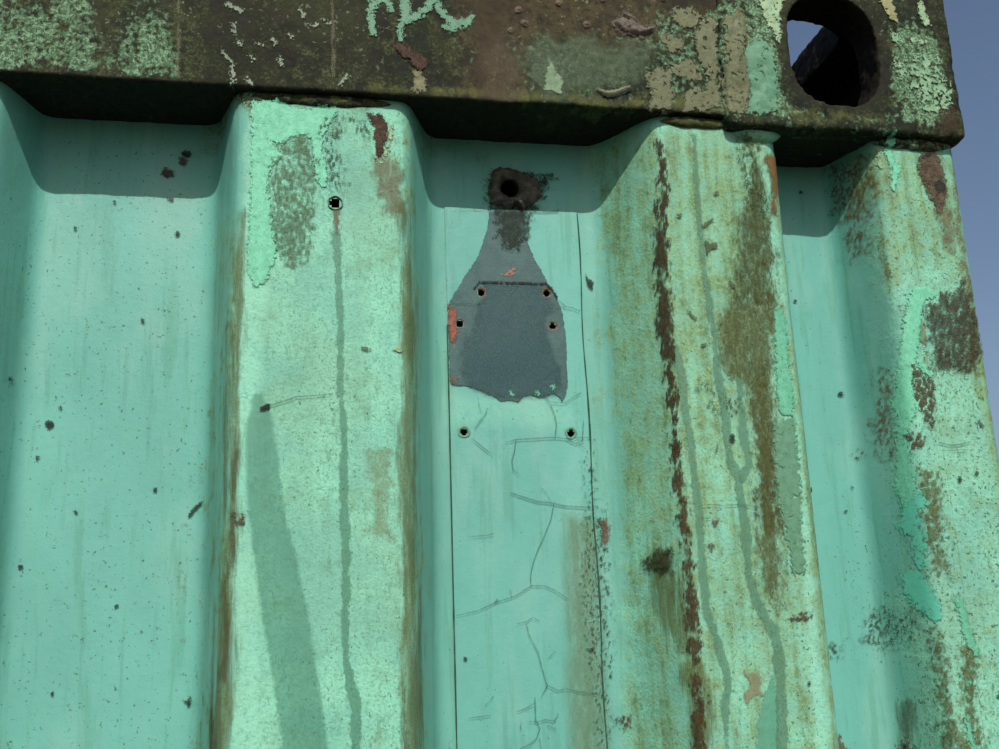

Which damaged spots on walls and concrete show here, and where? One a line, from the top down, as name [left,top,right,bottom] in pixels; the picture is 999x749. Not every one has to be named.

peeling [645,0,784,117]
peeling [879,0,953,121]
peeling [447,211,568,403]
rust [209,213,246,749]
rust [599,517,611,549]
rust [650,137,712,749]
damp [673,133,789,749]